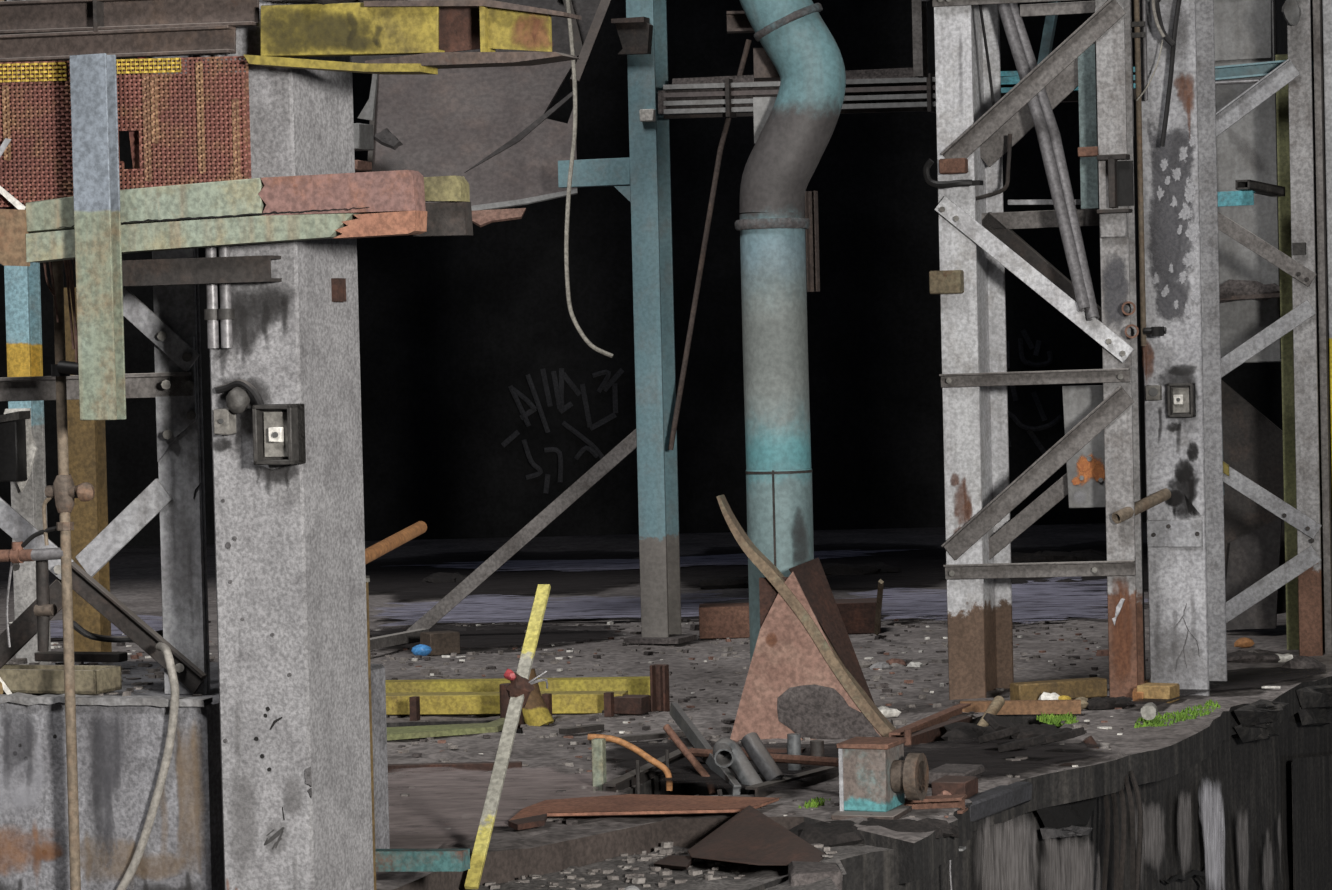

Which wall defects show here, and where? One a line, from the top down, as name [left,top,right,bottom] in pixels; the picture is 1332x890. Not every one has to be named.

peeling [1148,129,1201,319]
rust [951,475,972,533]
rust [1113,583,1132,675]
water stain [138,862,192,890]